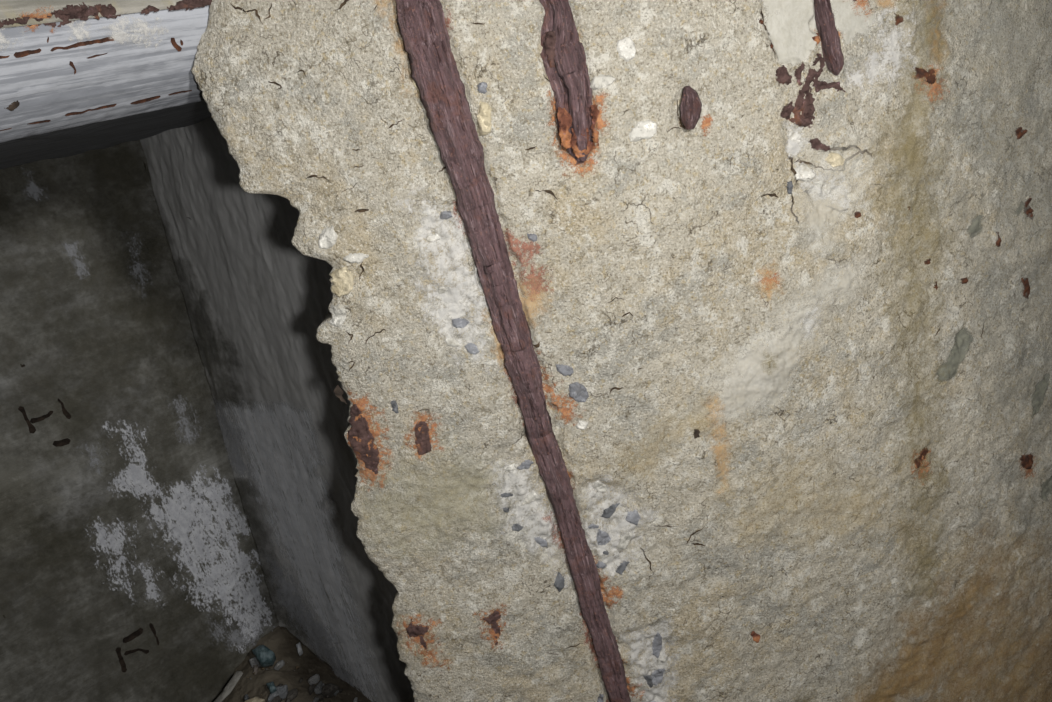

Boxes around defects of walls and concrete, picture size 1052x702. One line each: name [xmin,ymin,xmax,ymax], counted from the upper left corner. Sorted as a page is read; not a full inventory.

rust [0,37,115,59]
spalling [0,0,212,52]
spalling [763,0,916,92]
spalling [680,86,702,130]
rust [775,30,845,152]
spalling [785,123,850,208]
spalling [396,0,678,702]
leakage [0,166,382,702]
rust [347,391,393,491]
rust [404,411,443,460]
rust [397,614,451,669]
rust [474,605,506,649]